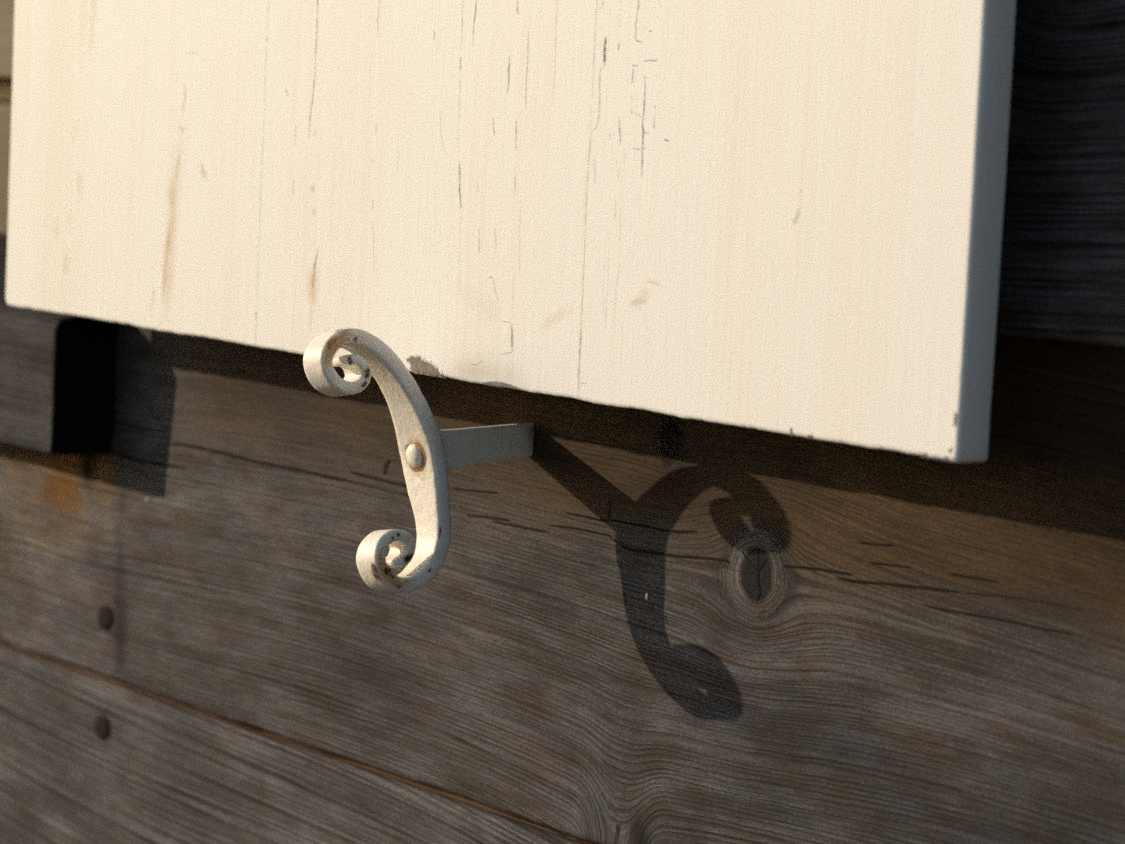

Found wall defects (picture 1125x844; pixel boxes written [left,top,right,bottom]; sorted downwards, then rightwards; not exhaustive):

peeling [407,356,444,378]
crack [452,487,1081,635]